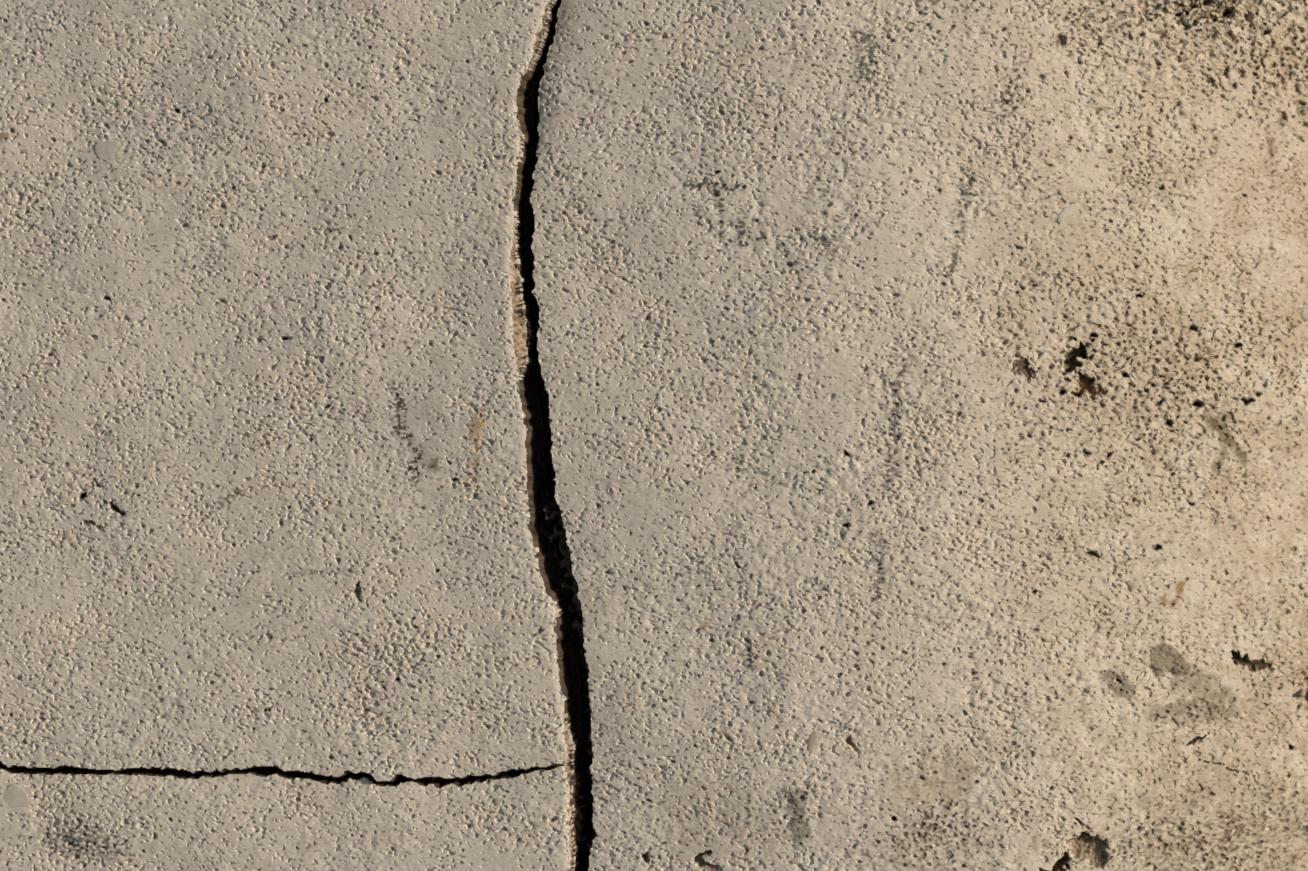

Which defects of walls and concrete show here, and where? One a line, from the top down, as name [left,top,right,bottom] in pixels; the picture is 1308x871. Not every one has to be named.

crack [0,0,597,871]